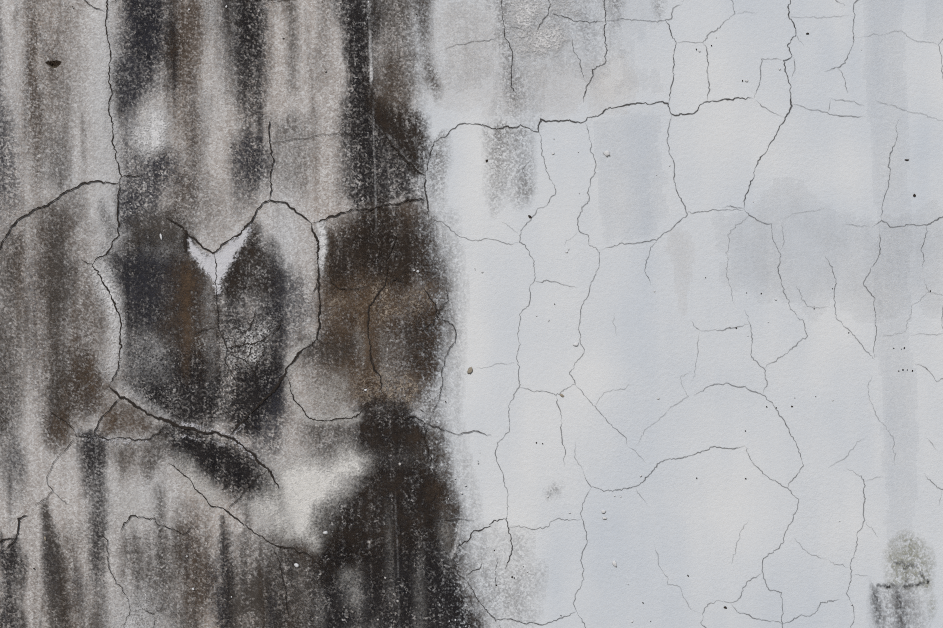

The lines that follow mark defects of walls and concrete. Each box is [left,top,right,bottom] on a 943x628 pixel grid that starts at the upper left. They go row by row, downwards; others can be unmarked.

leakage [0,0,481,628]
crack [0,0,761,612]
crack [619,0,796,244]